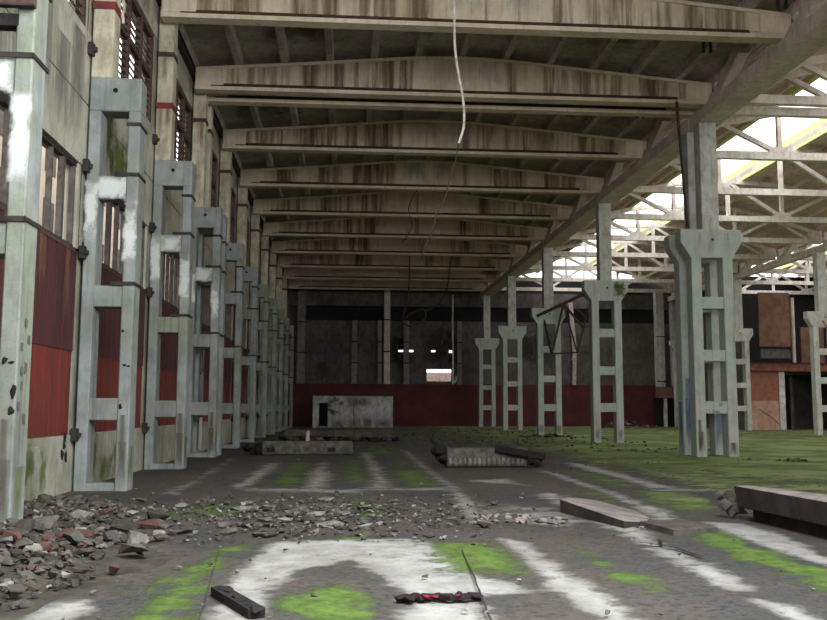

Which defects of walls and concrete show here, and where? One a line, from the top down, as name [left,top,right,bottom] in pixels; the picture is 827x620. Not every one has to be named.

leakage [304,60,343,87]
peeling [0,61,32,175]
leakage [106,118,127,177]
peeling [84,177,126,230]
peeling [150,236,181,279]
spalling [2,357,28,424]
crack [436,549,492,620]